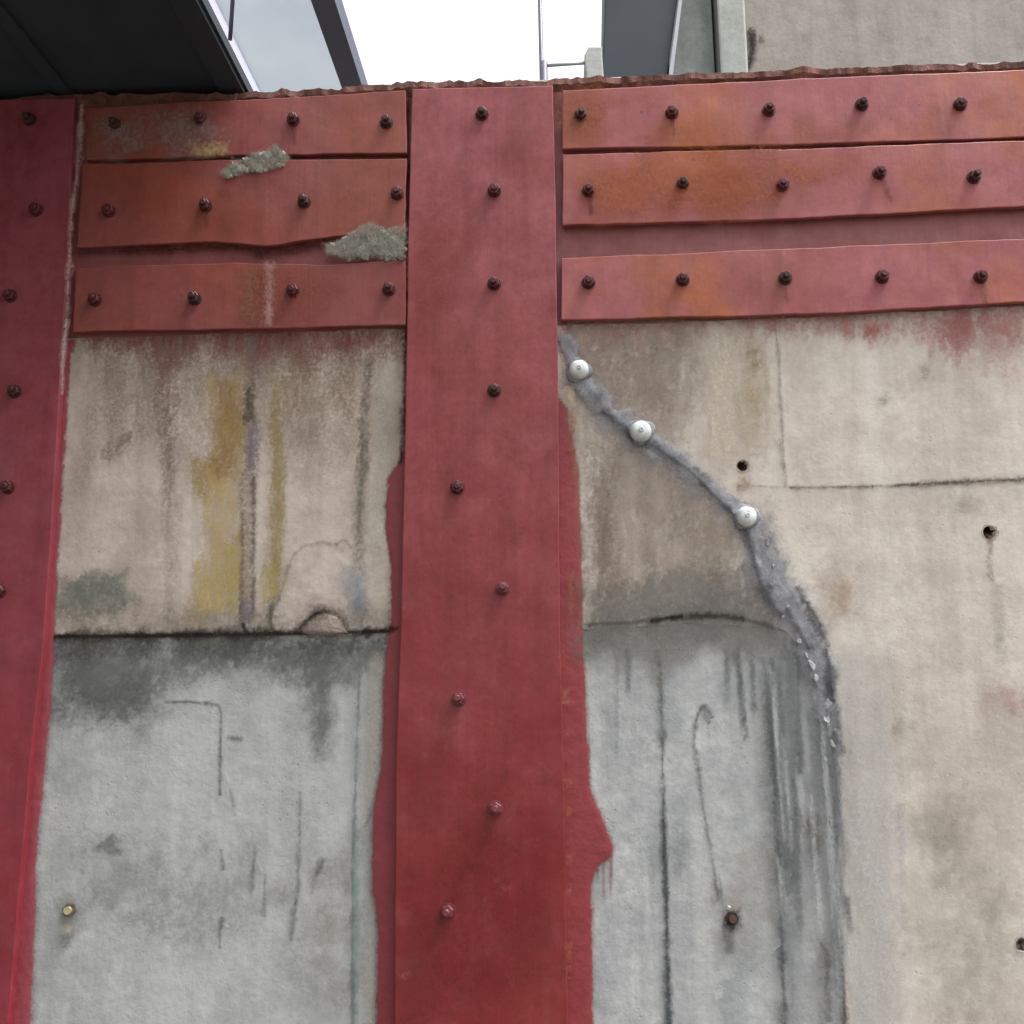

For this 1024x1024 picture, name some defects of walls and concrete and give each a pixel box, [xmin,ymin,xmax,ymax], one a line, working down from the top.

water stain [239,387,258,620]
water stain [355,384,384,555]
water stain [51,635,385,797]
crack [558,333,848,1024]
water stain [583,485,904,1024]